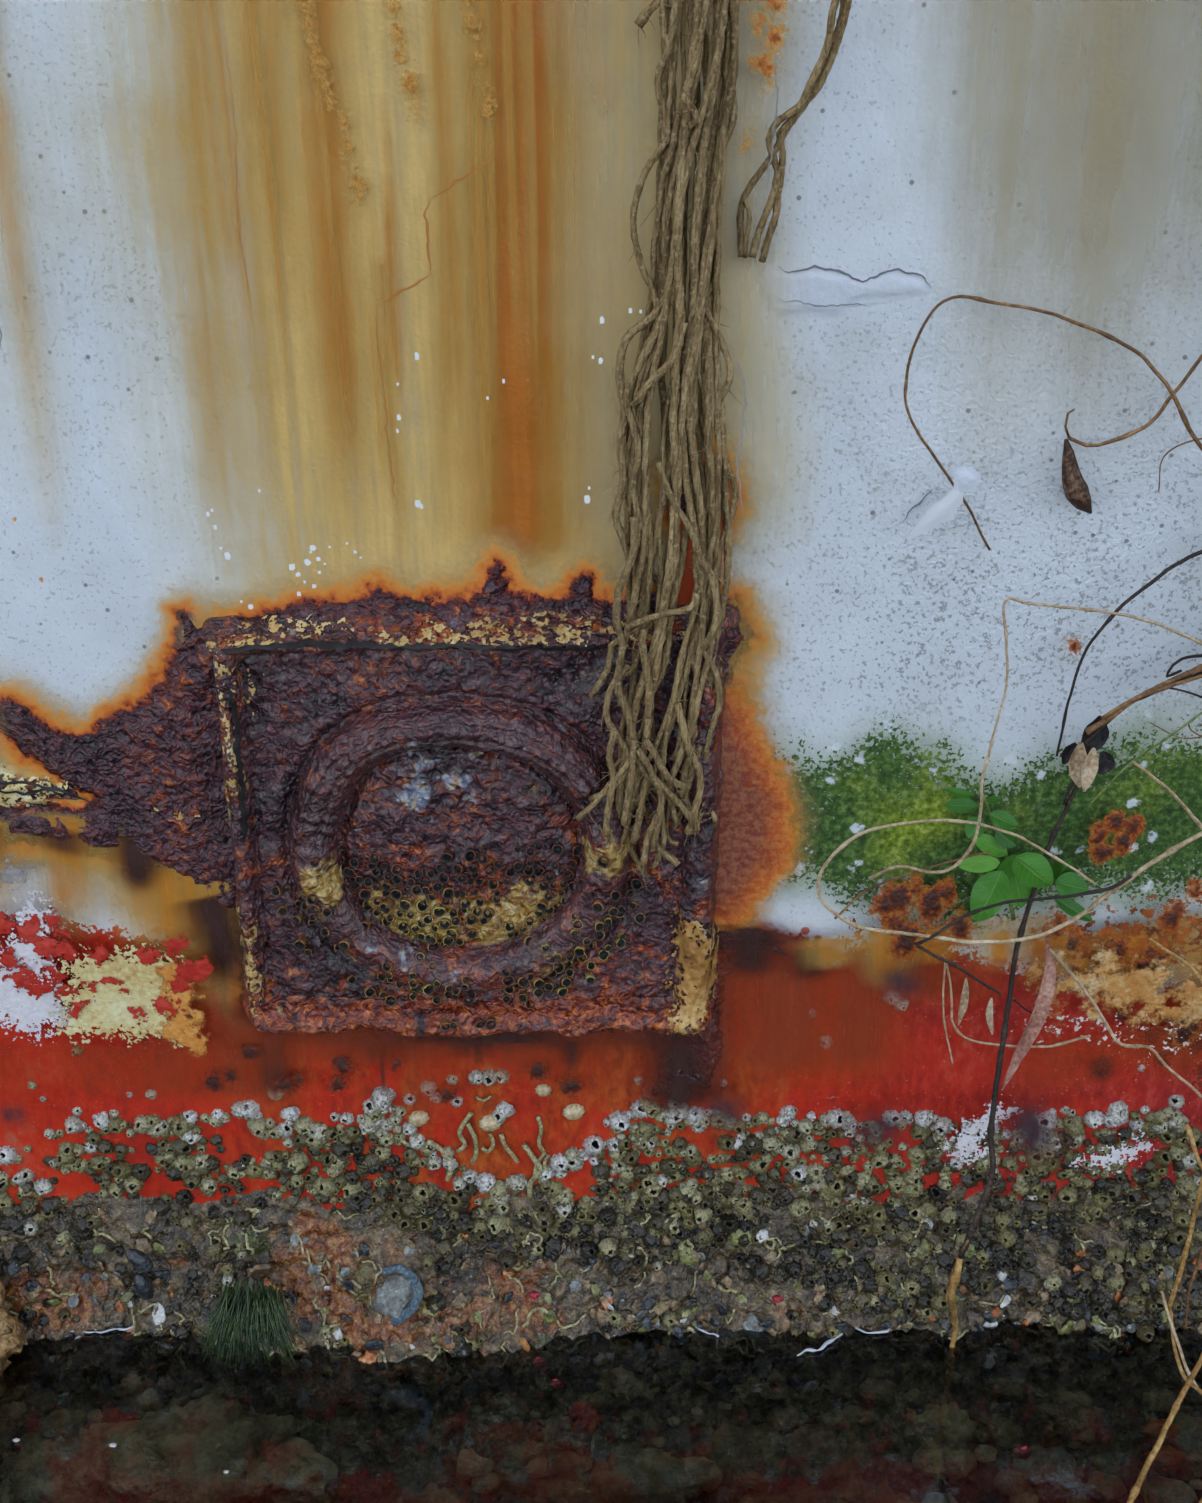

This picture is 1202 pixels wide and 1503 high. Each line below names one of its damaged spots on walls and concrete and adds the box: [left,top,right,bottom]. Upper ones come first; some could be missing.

peeling [0,853,215,1058]
rust [0,0,1202,1109]